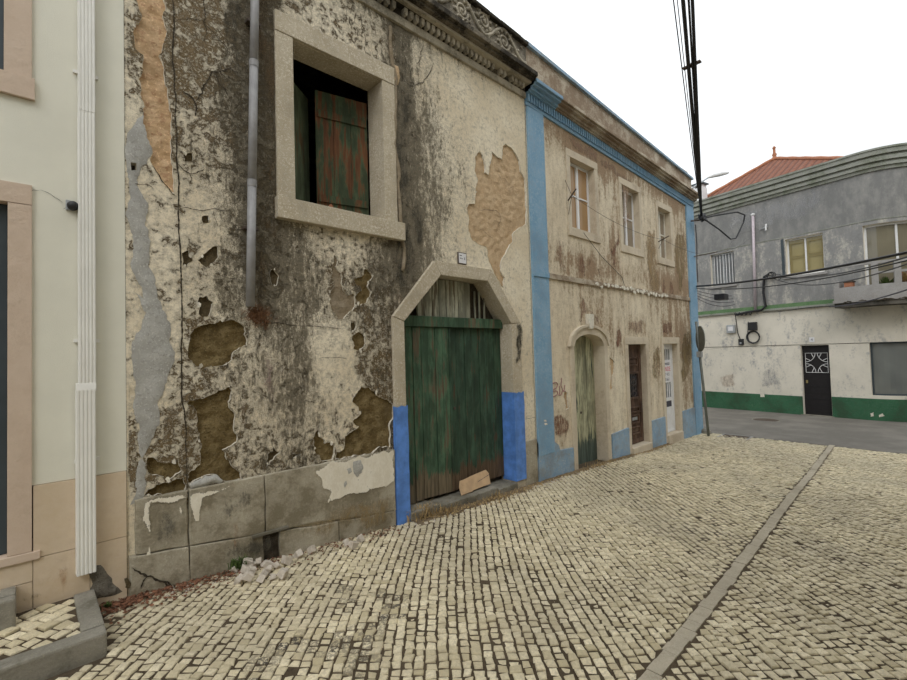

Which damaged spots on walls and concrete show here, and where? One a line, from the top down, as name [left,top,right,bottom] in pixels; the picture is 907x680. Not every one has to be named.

spalling [132,0,175,194]
crack [135,0,238,485]
spalling [188,296,248,368]
spalling [328,255,373,353]
spalling [467,143,527,287]
water stain [647,233,685,294]
water stain [681,329,692,381]
spalling [143,386,241,532]
spalling [313,385,395,503]
water stain [554,415,569,437]
peeling [89,565,131,599]